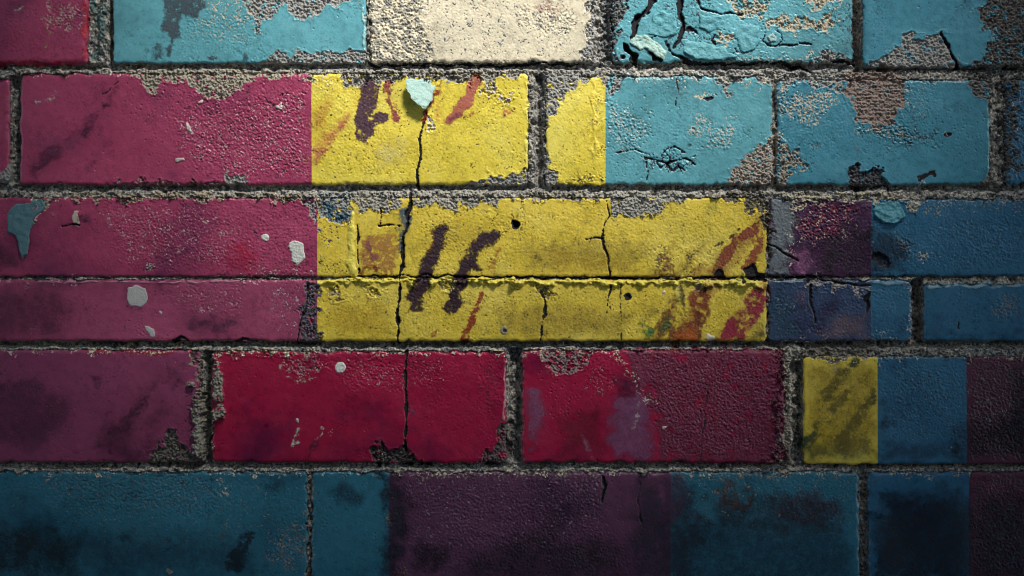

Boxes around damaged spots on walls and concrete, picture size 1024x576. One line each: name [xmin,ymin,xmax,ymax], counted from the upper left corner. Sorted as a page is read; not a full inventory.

spalling [125,0,1024,194]
crack [630,0,854,106]
peeling [6,133,921,284]
crack [356,118,871,460]
peeling [541,346,596,375]
spalling [137,429,205,471]
spalling [369,440,433,468]